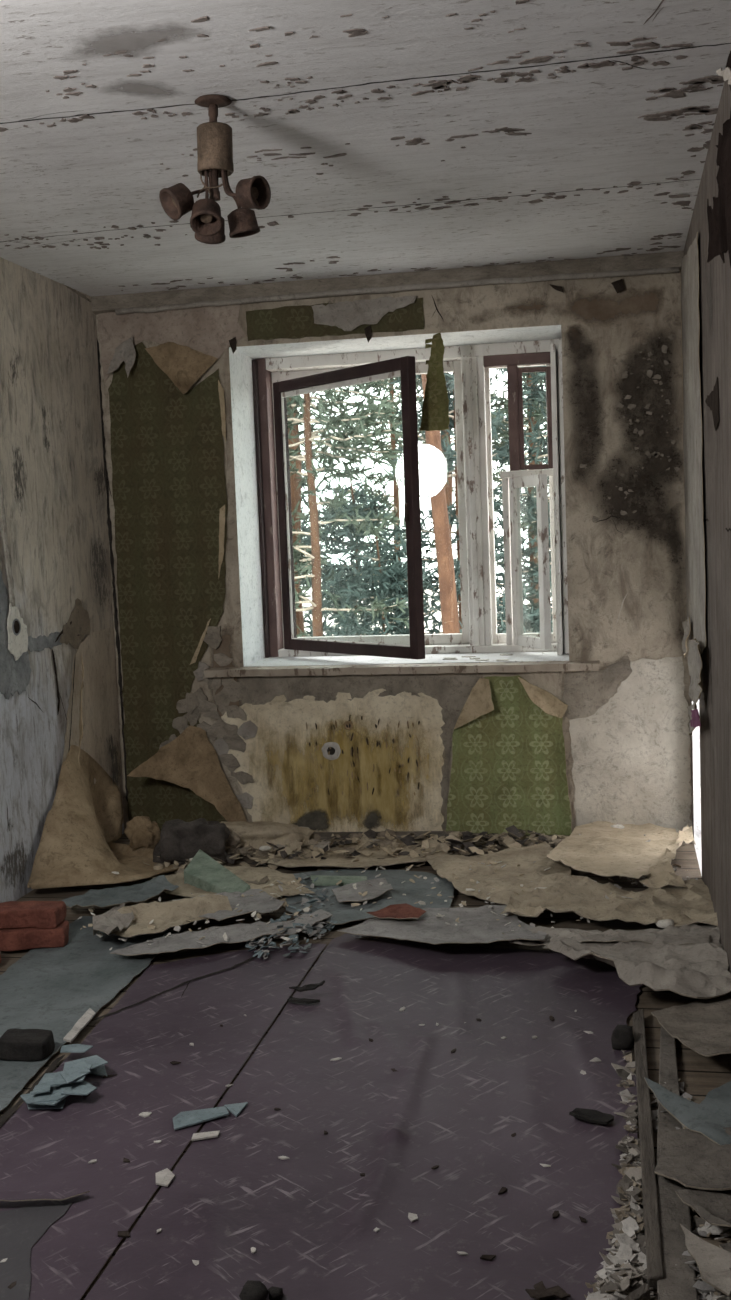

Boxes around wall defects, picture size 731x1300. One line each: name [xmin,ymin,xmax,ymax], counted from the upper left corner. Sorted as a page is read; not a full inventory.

peeling [46,64,96,99]
peeling [225,26,395,118]
peeling [340,14,367,37]
peeling [411,37,691,96]
peeling [247,143,350,175]
peeling [347,75,725,216]
peeling [5,220,187,249]
peeling [119,256,391,291]
damp [566,290,684,599]
flaking render [0,570,91,700]
peeling [159,626,482,832]
peeling [563,617,703,833]